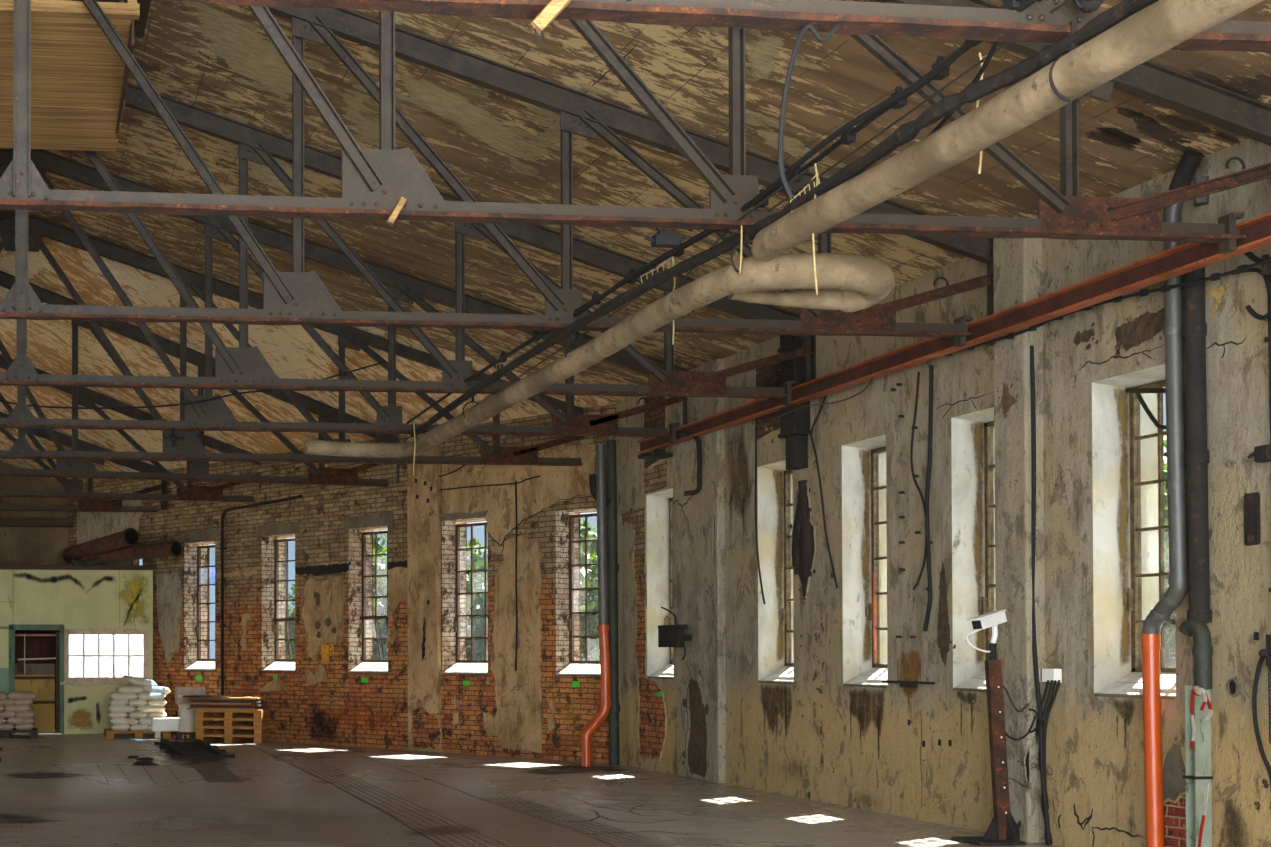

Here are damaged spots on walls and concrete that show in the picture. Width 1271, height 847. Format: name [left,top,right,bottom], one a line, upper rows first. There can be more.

peeling [172,2,305,109]
peeling [1190,70,1271,101]
peeling [395,75,577,180]
peeling [746,112,847,178]
peeling [1086,107,1241,152]
peeling [0,250,57,297]
peeling [82,250,178,305]
peeling [1073,322,1099,350]
peeling [1114,308,1165,359]
peeling [997,383,1018,418]
damp [761,686,792,733]
damp [850,689,883,754]